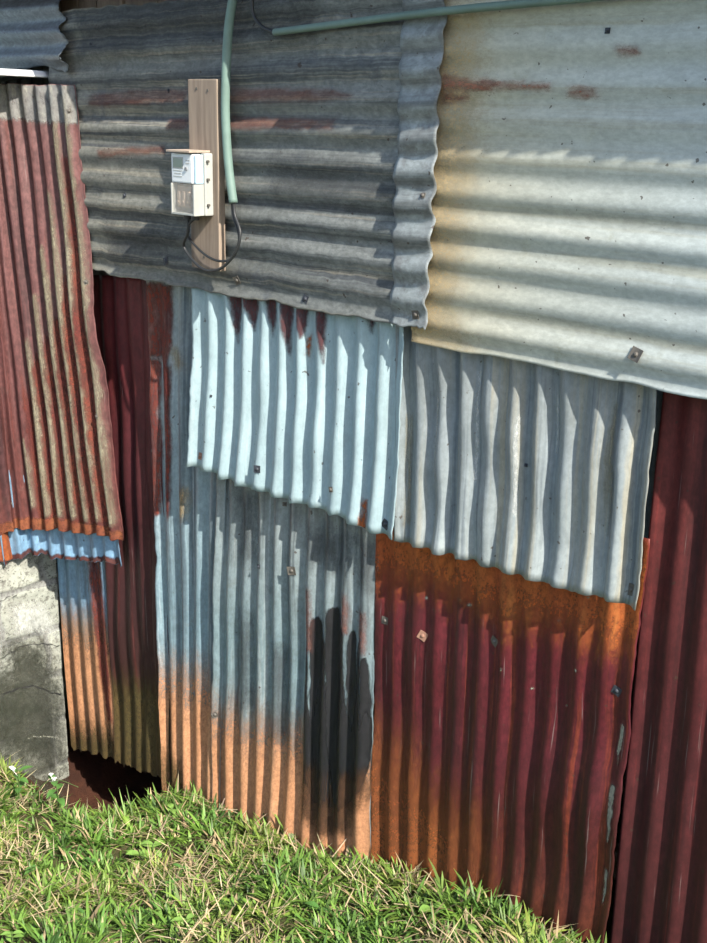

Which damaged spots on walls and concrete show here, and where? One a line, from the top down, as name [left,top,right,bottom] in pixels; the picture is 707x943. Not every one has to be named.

corrosion [0,158,123,722]
corrosion [146,282,182,516]
corrosion [229,297,326,361]
corrosion [358,500,367,528]
corrosion [375,527,647,650]
damp [0,606,183,802]
corrosion [370,732,482,897]
peeling [607,785,615,842]